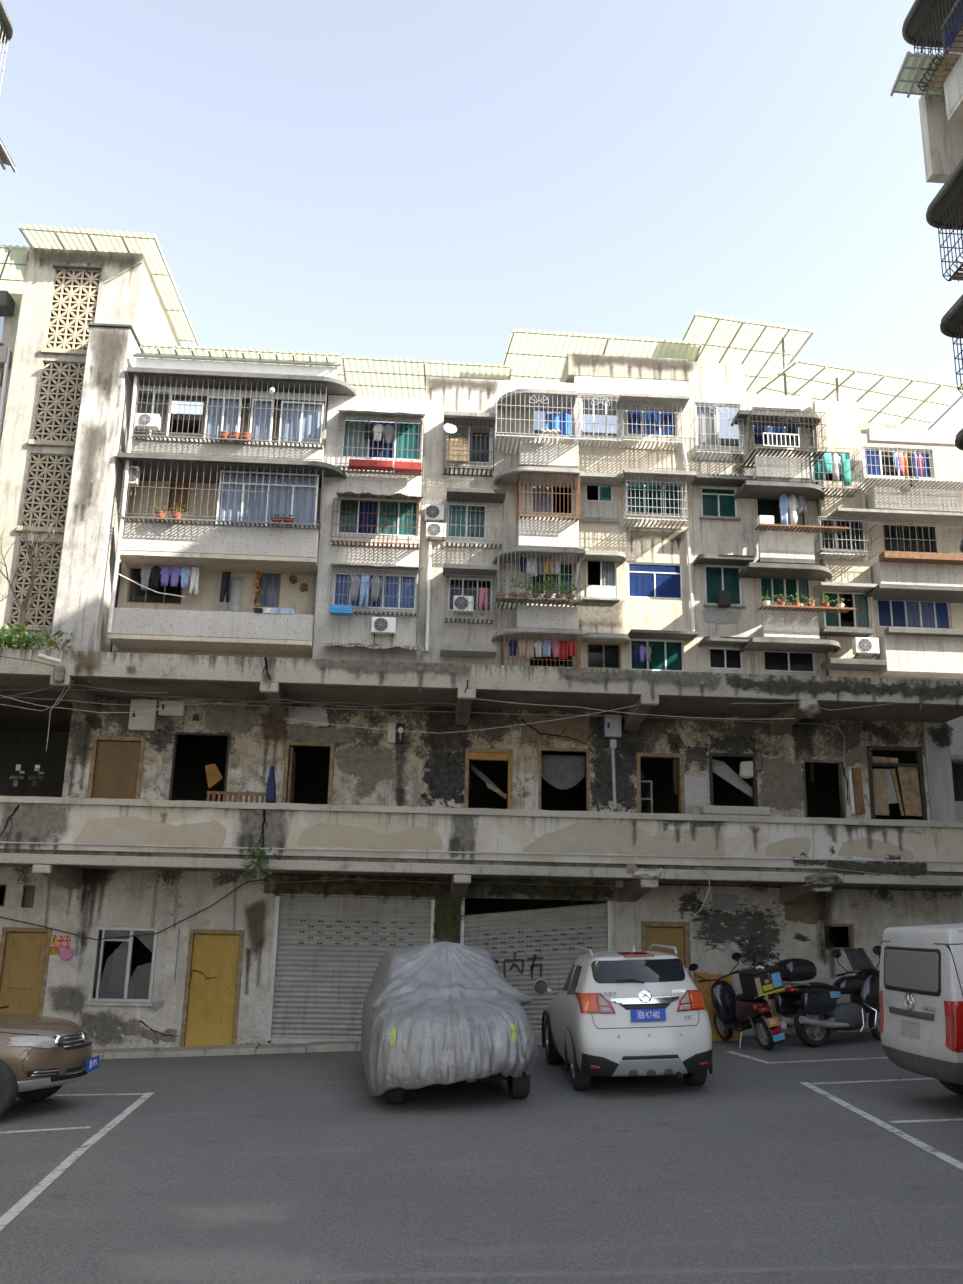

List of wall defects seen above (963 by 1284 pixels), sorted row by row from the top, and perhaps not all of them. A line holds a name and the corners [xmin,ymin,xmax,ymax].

water stain [91,329,126,396]
water stain [76,427,103,520]
peeling [145,720,184,753]
water stain [664,820,722,841]
water stain [793,825,928,879]
water stain [71,868,111,945]
water stain [246,901,266,993]
water stain [49,987,127,1044]